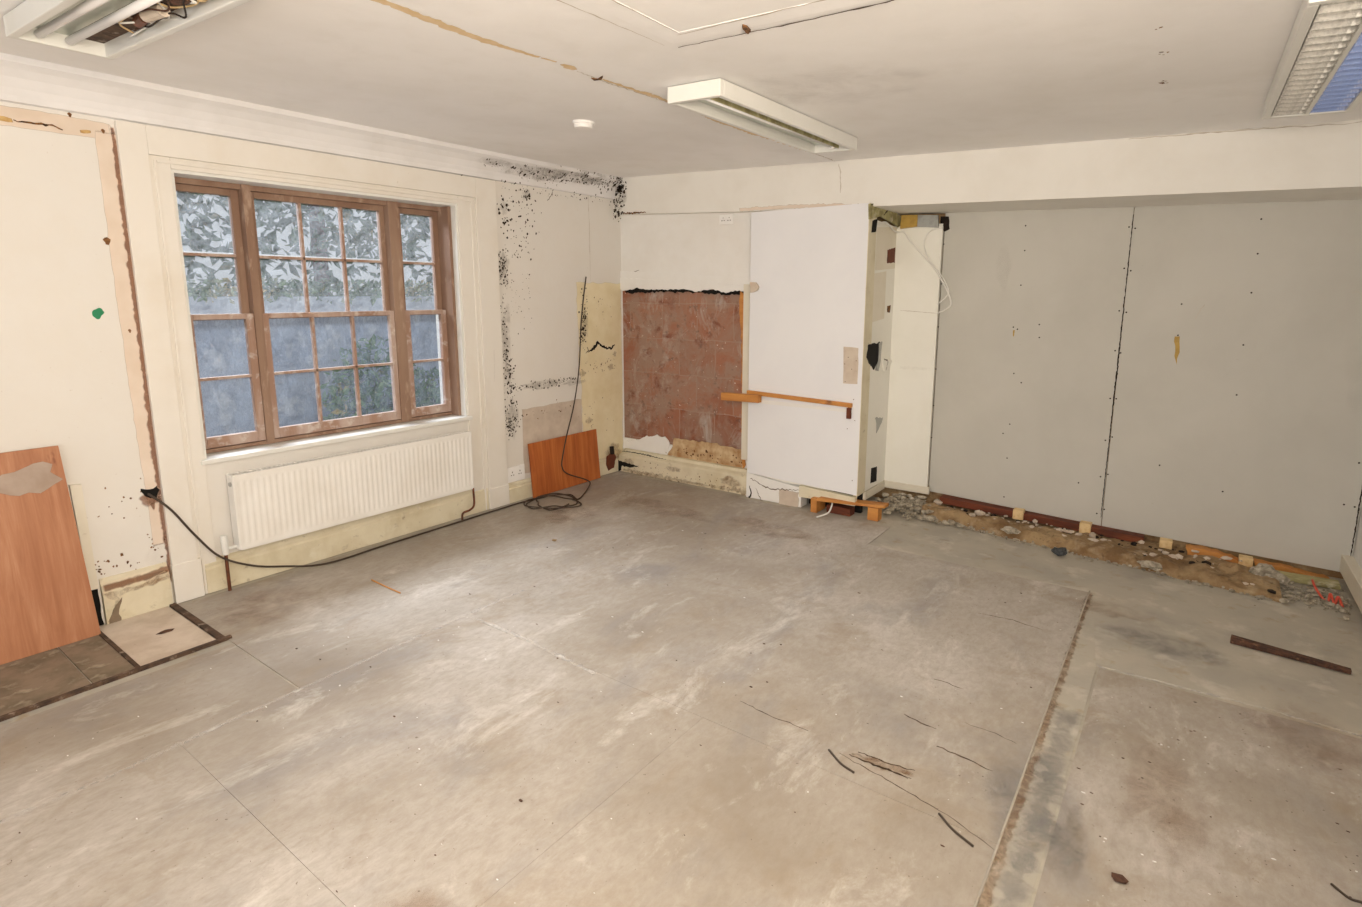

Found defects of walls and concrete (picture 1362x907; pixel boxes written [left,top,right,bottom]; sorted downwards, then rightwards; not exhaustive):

flaking render [0,116,63,130]
peeling [371,0,668,103]
water stain [484,159,627,437]
flaking render [520,278,745,473]